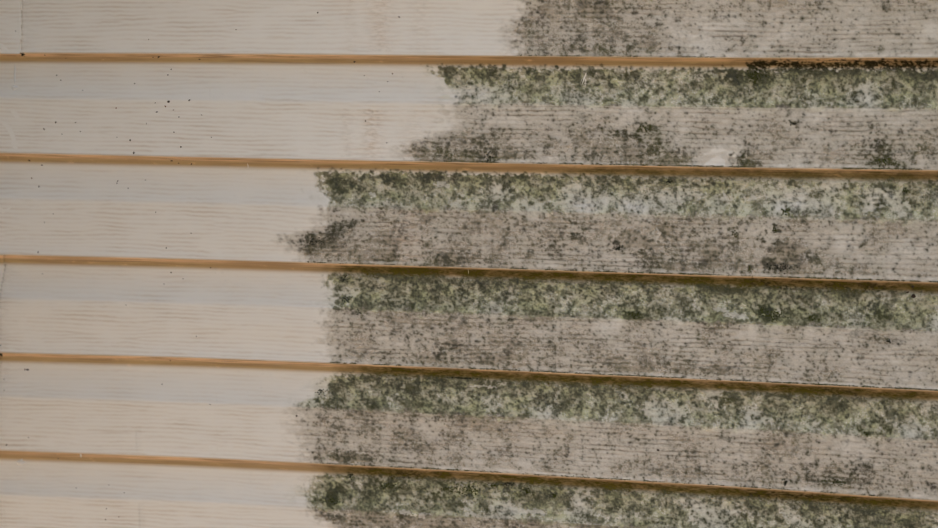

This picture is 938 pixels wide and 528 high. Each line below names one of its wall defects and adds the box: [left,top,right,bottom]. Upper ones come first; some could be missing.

damp [291,0,938,528]